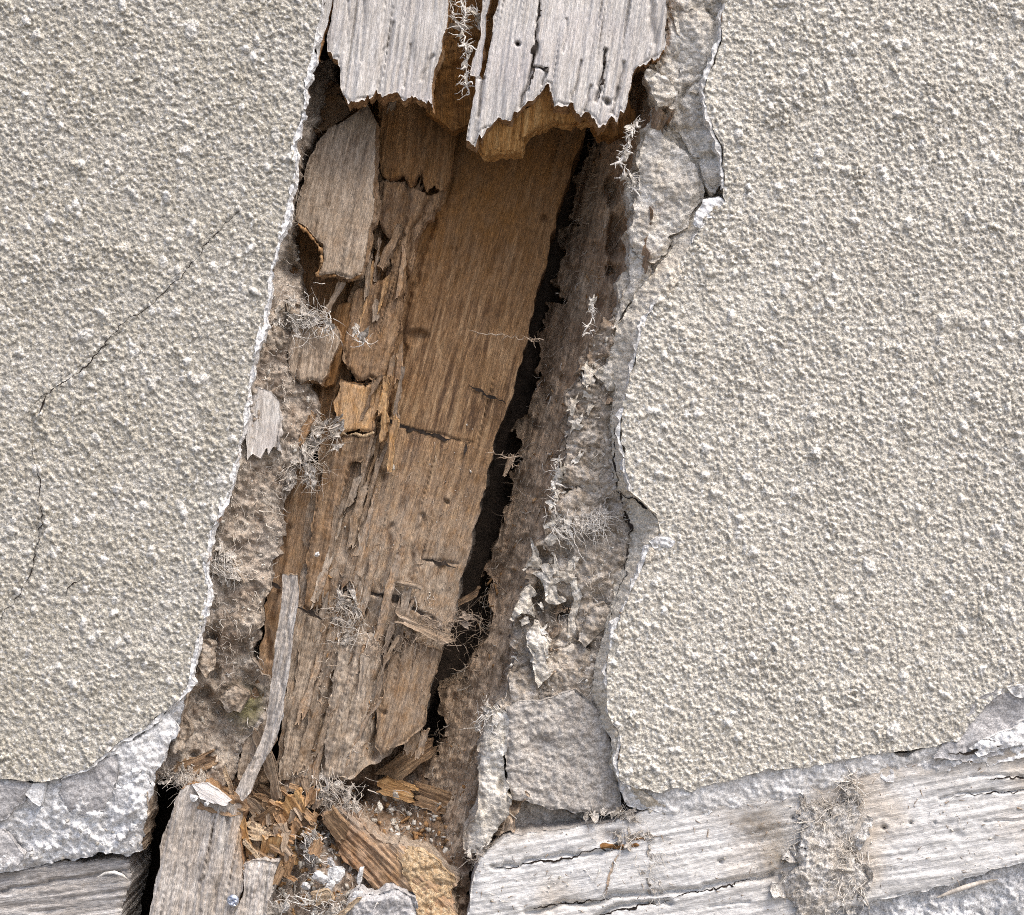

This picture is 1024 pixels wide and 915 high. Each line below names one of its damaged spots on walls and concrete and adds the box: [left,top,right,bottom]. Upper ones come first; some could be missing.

crack [0,211,239,620]
spalling [0,0,326,873]
spalling [424,3,1024,864]